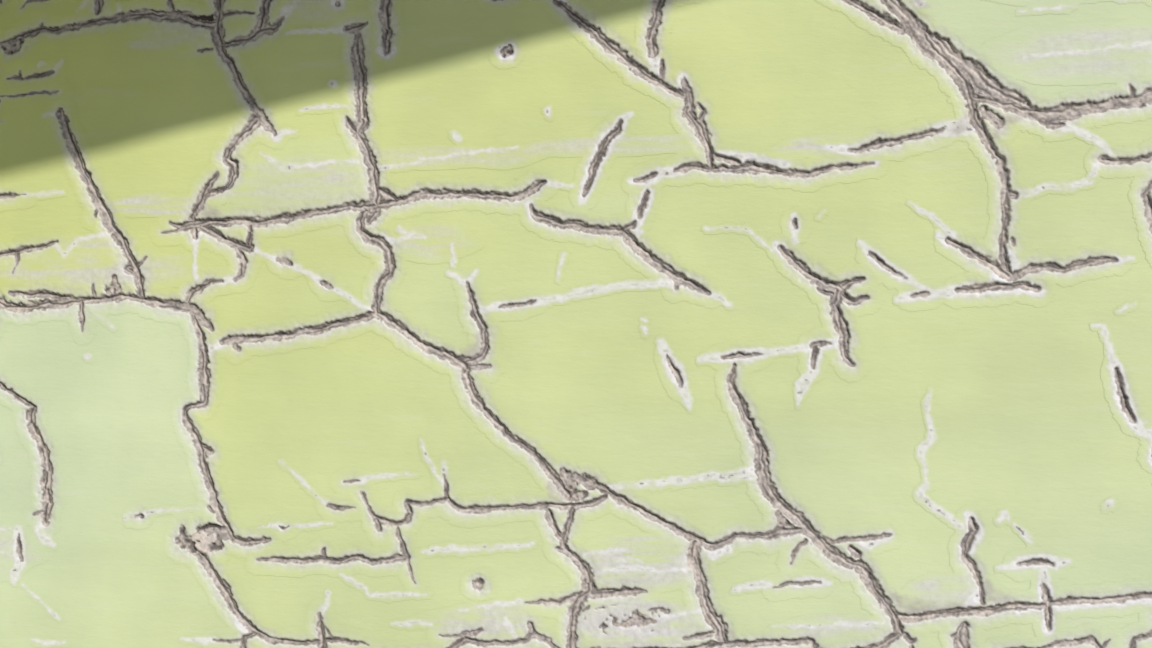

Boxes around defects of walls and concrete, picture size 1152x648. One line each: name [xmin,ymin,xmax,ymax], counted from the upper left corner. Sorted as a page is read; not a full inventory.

crack [0,0,1152,365]
crack [0,367,70,648]
crack [170,222,1152,648]